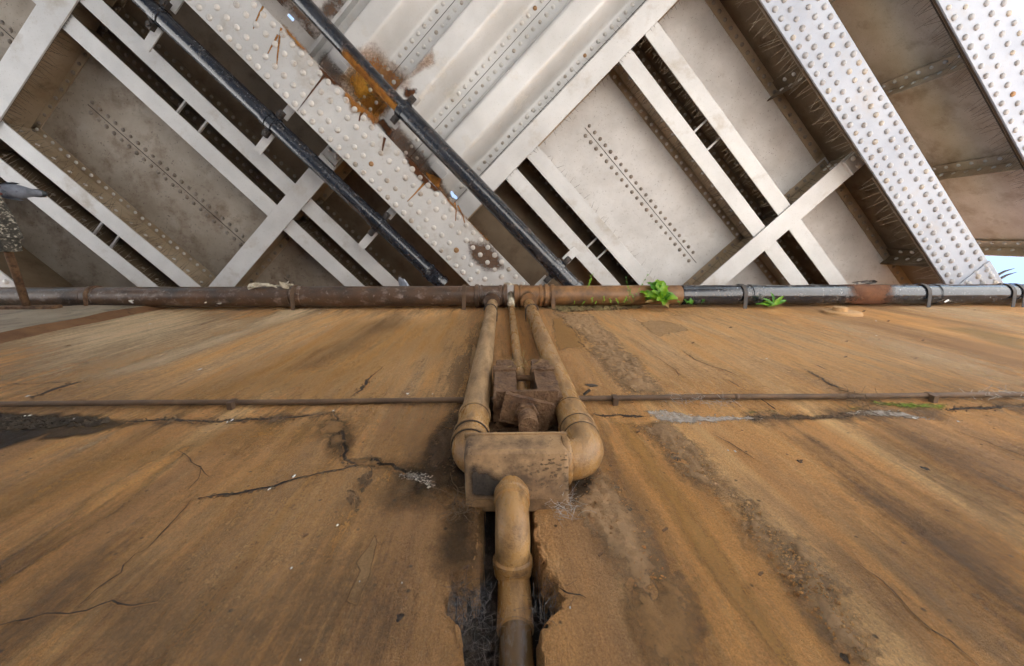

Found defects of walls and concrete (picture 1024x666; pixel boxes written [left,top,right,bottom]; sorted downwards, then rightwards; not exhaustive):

corrosion [297,50,488,241]
leakage [0,307,482,450]
leakage [648,409,784,425]
leakage [828,408,938,420]
crack [0,366,413,629]